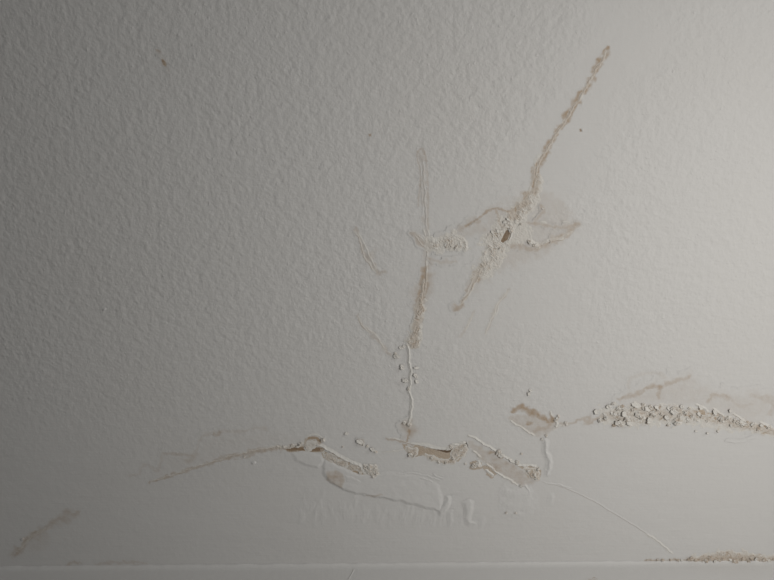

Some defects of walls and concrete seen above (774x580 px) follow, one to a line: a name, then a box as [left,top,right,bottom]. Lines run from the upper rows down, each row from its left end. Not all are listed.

crack [355,45,612,443]
crack [560,401,774,444]
crack [147,432,380,485]
crack [638,548,774,564]